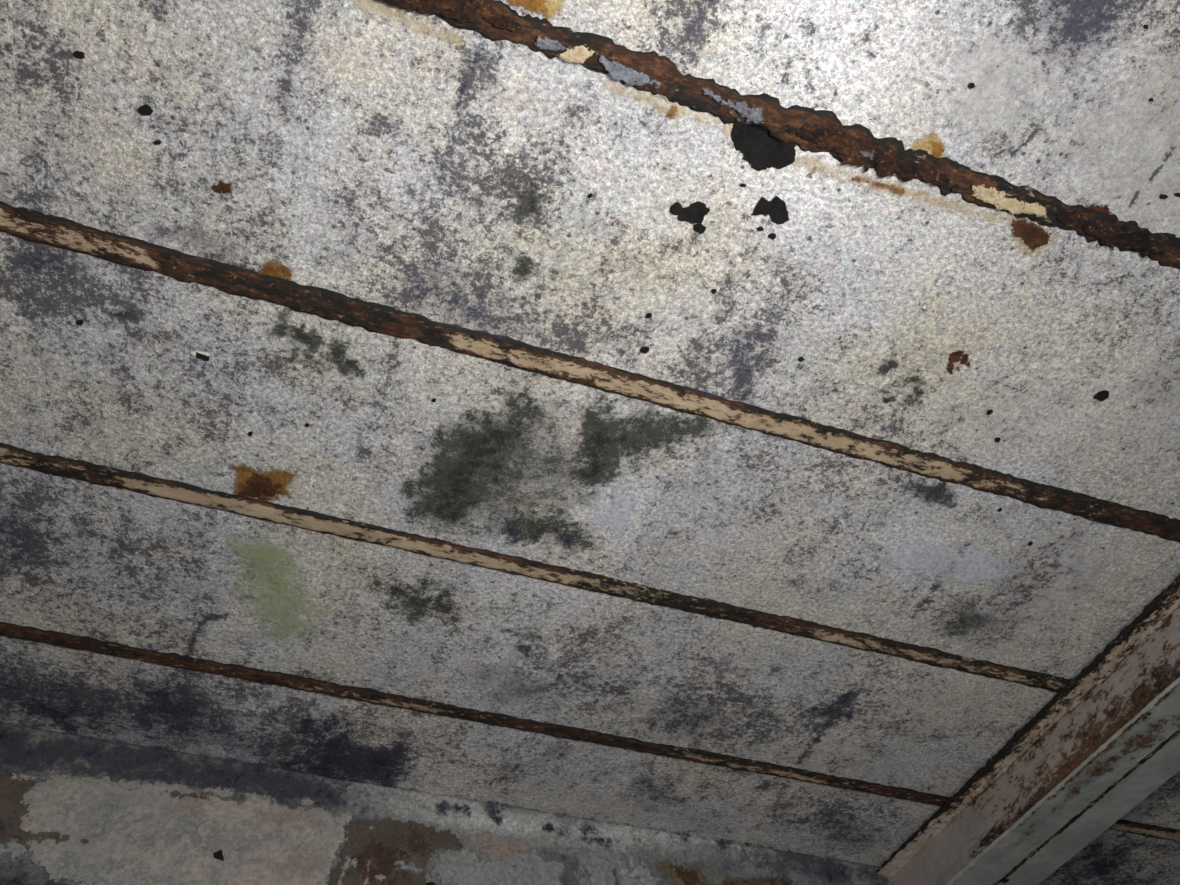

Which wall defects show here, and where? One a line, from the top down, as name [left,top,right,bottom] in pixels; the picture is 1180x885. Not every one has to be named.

corrosion [377,0,565,33]
peeling [599,55,661,89]
spalling [138,104,153,116]
hole [731,123,796,171]
corrosion [782,124,957,194]
hole [751,196,789,240]
corrosion [1005,203,1166,258]
corrosion [258,260,293,282]
corrosion [229,464,296,502]
damp [399,368,715,561]